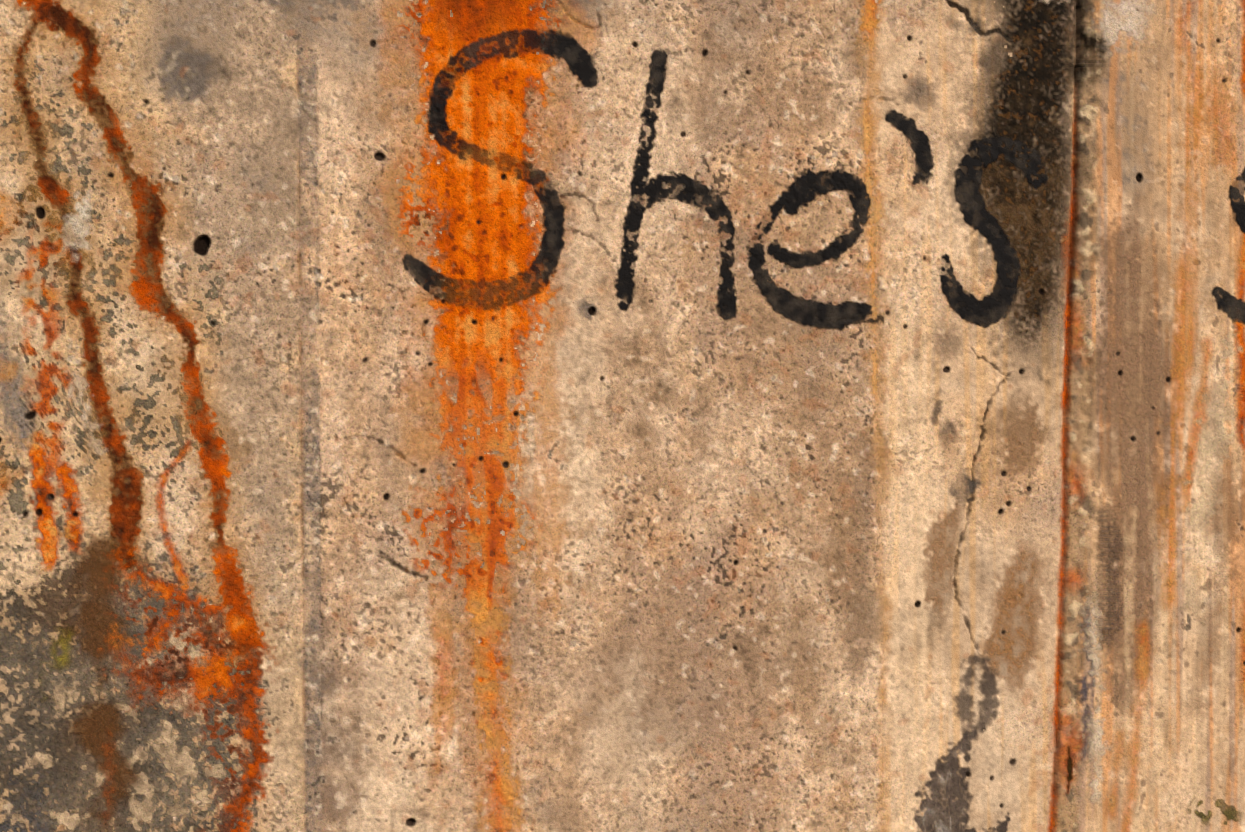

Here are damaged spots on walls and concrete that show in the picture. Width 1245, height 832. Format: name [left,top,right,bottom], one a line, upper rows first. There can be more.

crack [946,0,1003,36]
damp [964,0,1154,346]
rust [13,0,270,832]
rust [395,0,565,832]
crack [953,357,1009,592]
rust [1049,194,1076,832]
damp [1080,222,1171,802]
rust [1236,320,1245,447]
damp [914,553,1036,832]